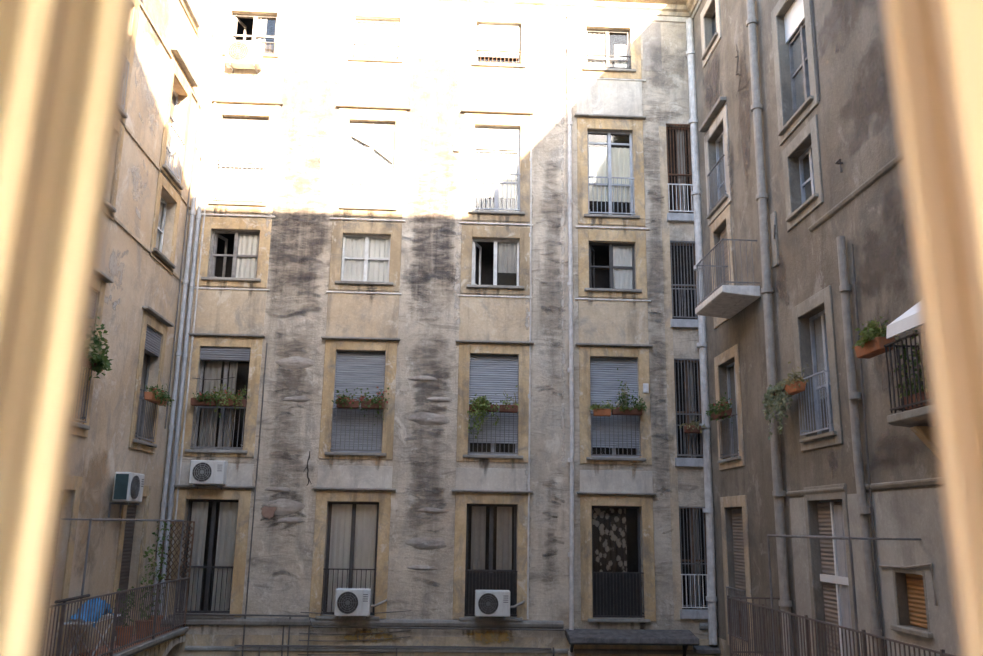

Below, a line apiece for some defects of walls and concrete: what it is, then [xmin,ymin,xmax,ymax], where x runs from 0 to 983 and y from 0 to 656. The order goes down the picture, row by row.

leakage [269,49,341,308]
leakage [406,59,465,302]